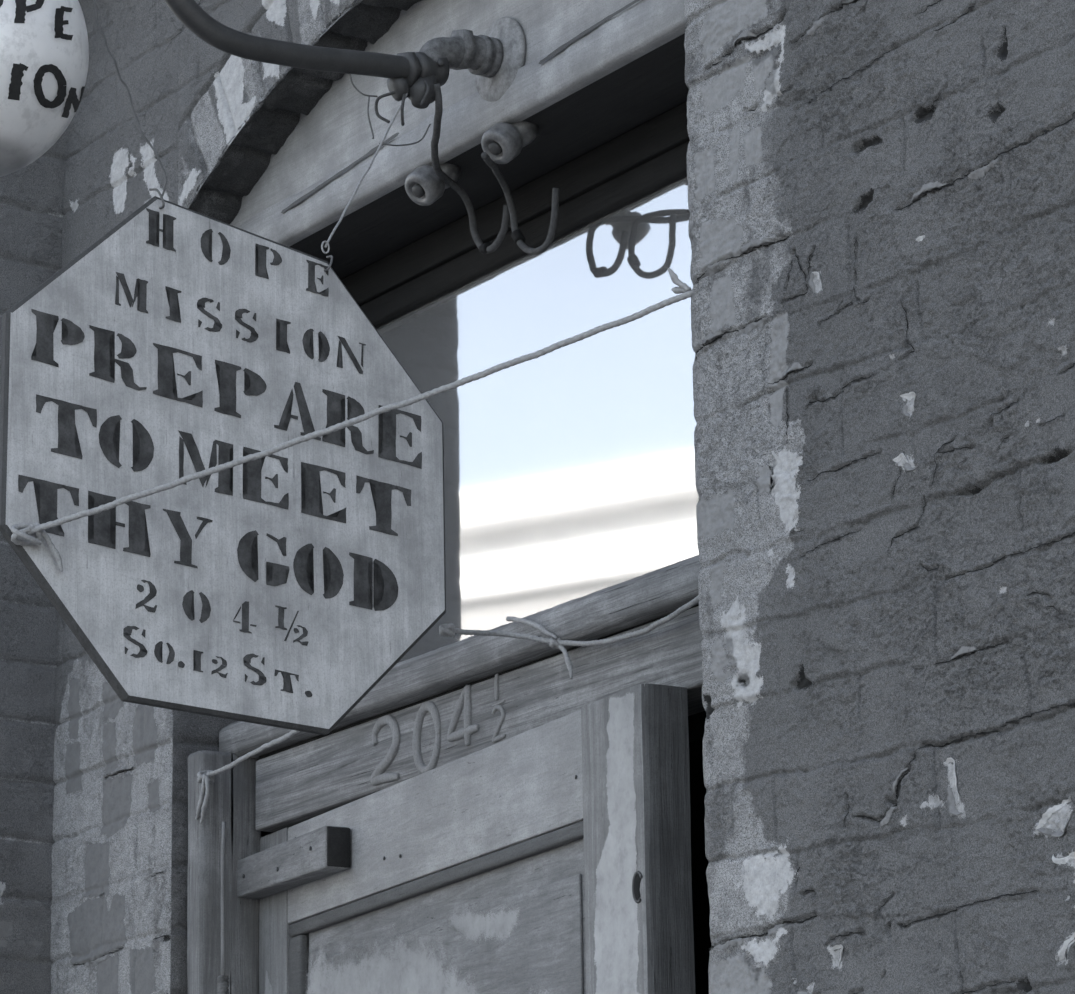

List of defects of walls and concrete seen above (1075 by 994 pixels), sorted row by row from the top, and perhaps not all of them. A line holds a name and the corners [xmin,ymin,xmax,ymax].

peeling [698,0,779,114]
peeling [893,453,917,473]
crack [888,435,969,551]
peeling [920,757,966,819]
crack [844,703,1075,826]
peeling [1033,796,1075,883]
peeling [1055,930,1075,966]